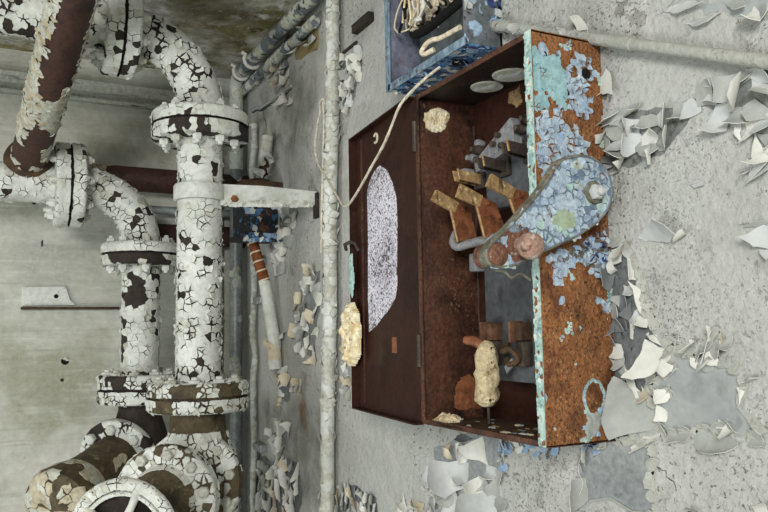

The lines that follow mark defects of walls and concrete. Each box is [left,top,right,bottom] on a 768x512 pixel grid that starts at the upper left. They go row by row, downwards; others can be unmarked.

peeling [656,0,768,27]
peeling [595,68,768,184]
peeling [221,0,378,512]
peeling [569,238,768,512]
peeling [395,433,559,512]